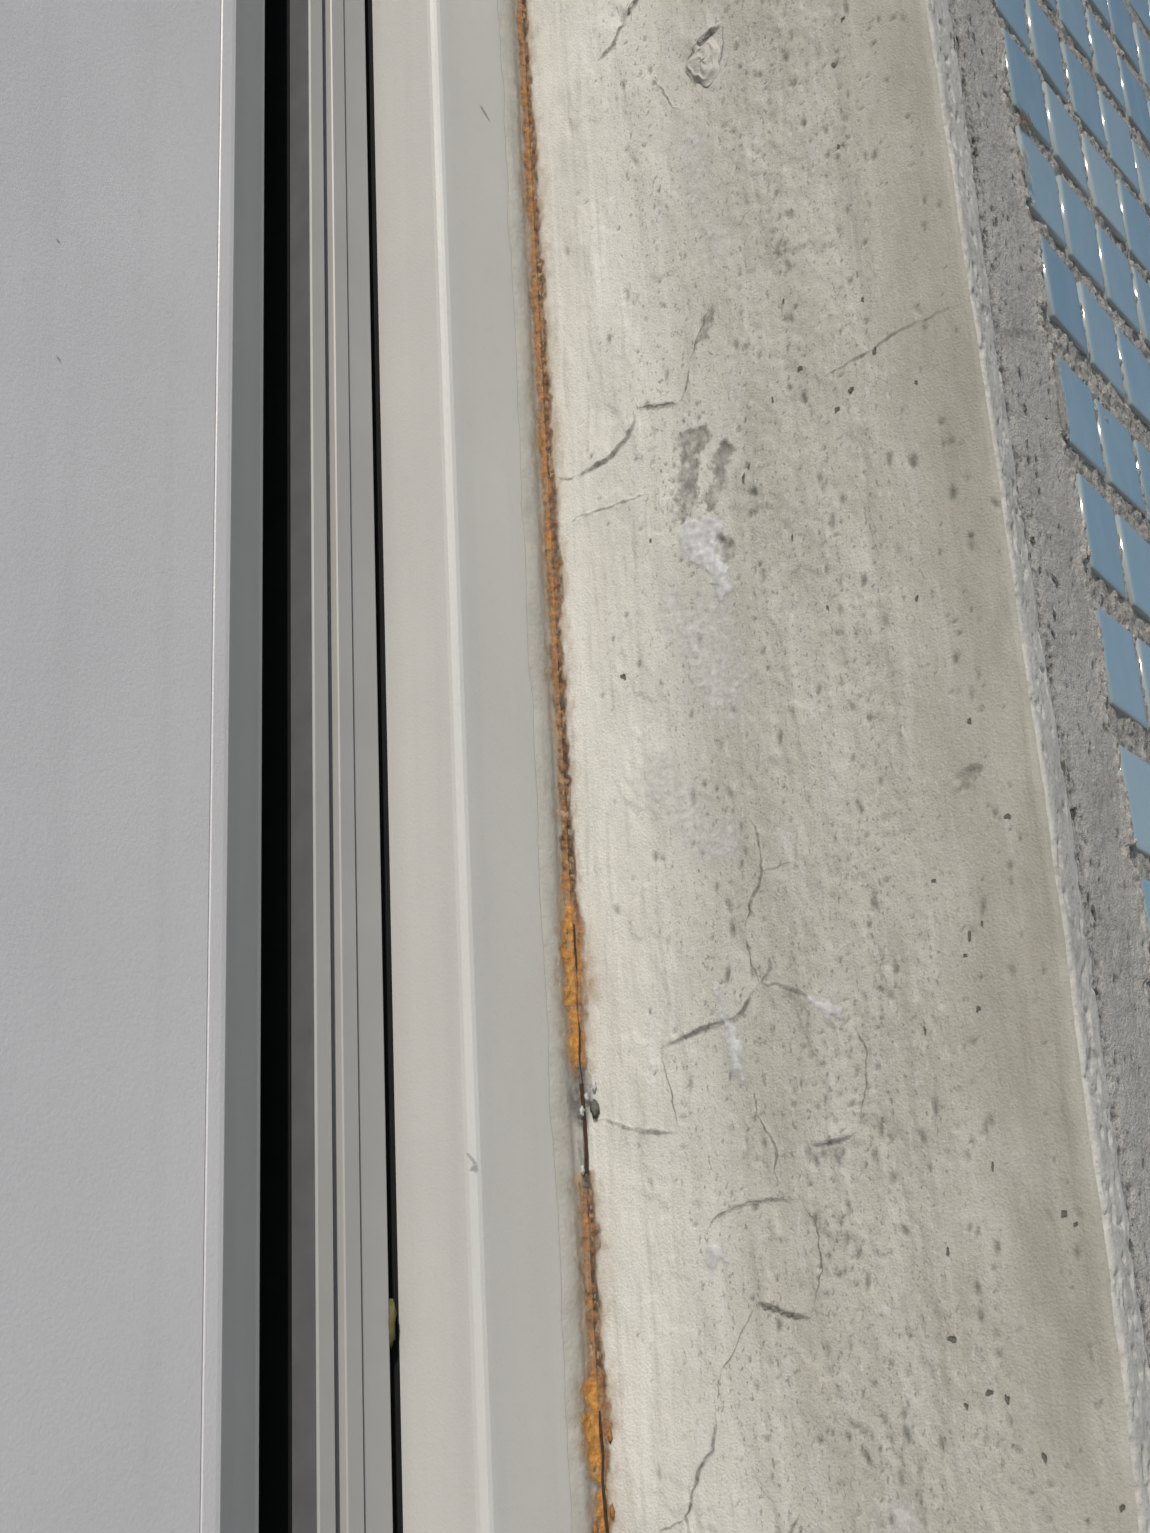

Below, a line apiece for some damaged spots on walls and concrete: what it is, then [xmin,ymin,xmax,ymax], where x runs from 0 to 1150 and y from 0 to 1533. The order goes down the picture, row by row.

rust [517,0,591,1083]
crack [622,834,801,1134]
rust [575,1171,615,1533]
crack [662,1439,715,1530]